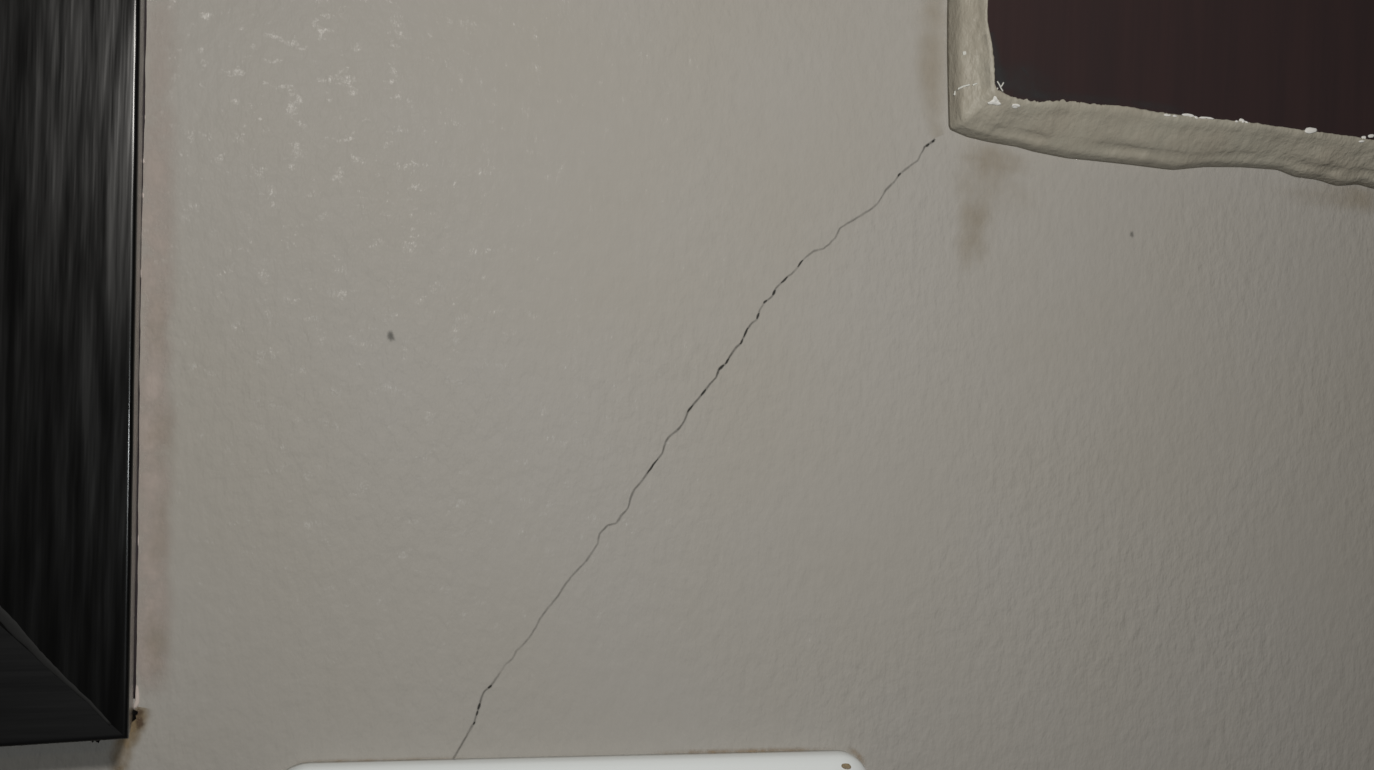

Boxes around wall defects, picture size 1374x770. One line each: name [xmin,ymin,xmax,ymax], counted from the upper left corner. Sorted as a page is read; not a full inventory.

crack [688,260,803,411]